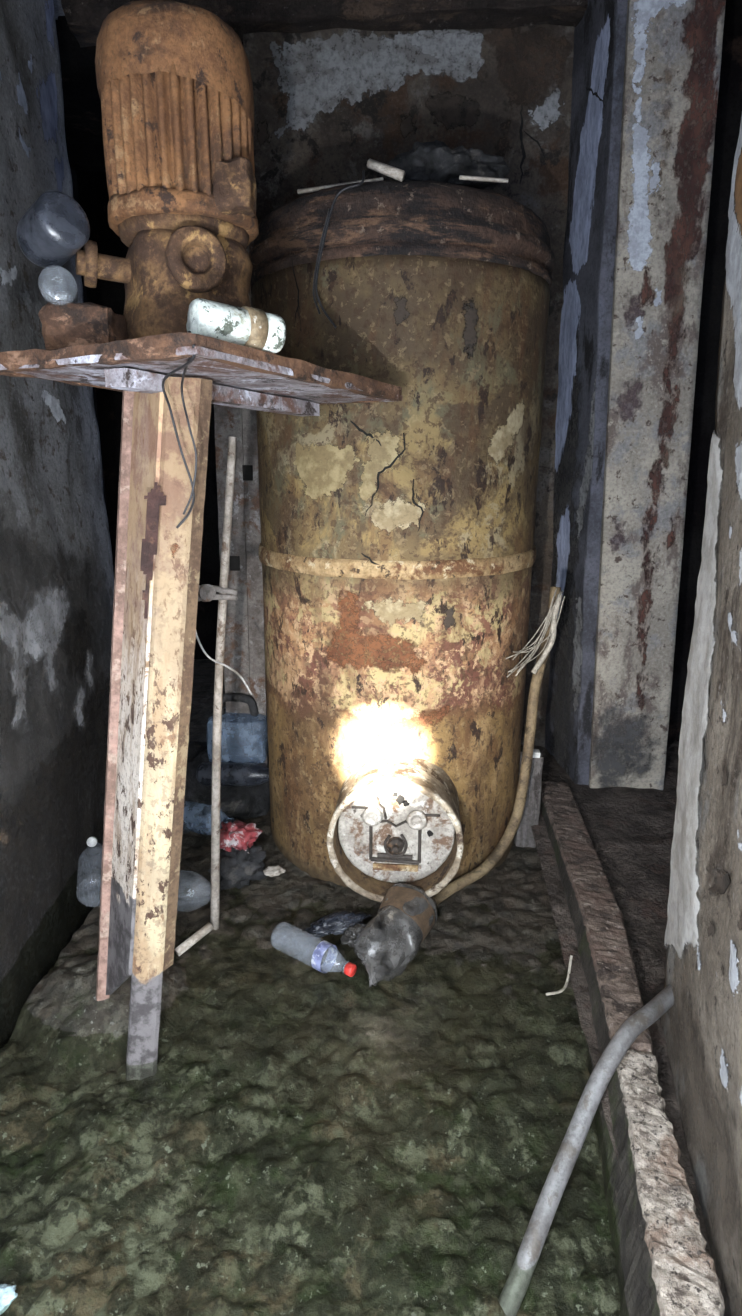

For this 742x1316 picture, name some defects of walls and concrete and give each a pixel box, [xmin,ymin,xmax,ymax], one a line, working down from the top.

peeling [627,0,688,271]
peeling [725,116,742,410]
peeling [635,316,645,341]
corrosion [631,0,726,710]
peeling [729,522,742,586]
peeling [728,613,741,651]
flaking render [706,863,731,896]
flaking render [697,918,715,971]
peeling [721,909,742,996]
peeling [720,1048,742,1105]